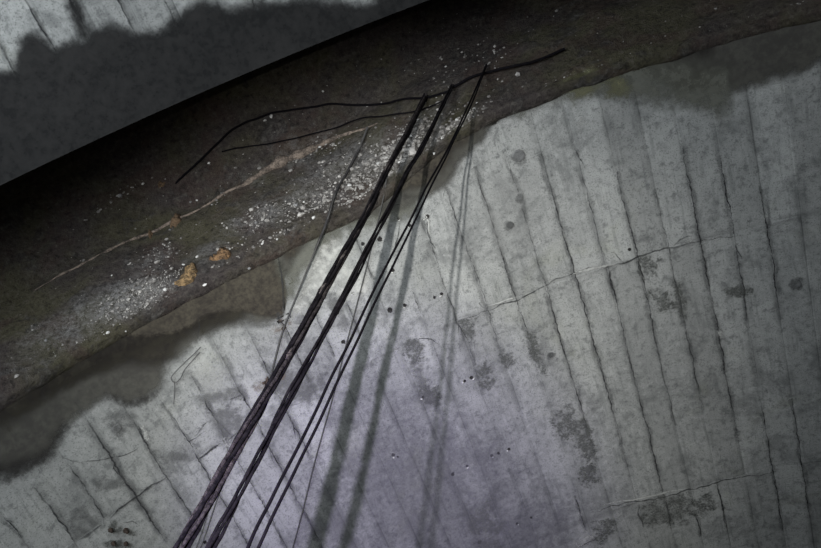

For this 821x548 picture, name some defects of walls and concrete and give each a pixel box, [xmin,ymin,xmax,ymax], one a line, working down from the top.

water stain [0,0,428,185]
water stain [561,20,821,113]
water stain [277,126,486,311]
crack [489,236,729,306]
water stain [0,310,243,425]
crack [84,480,162,537]
crack [603,471,776,524]